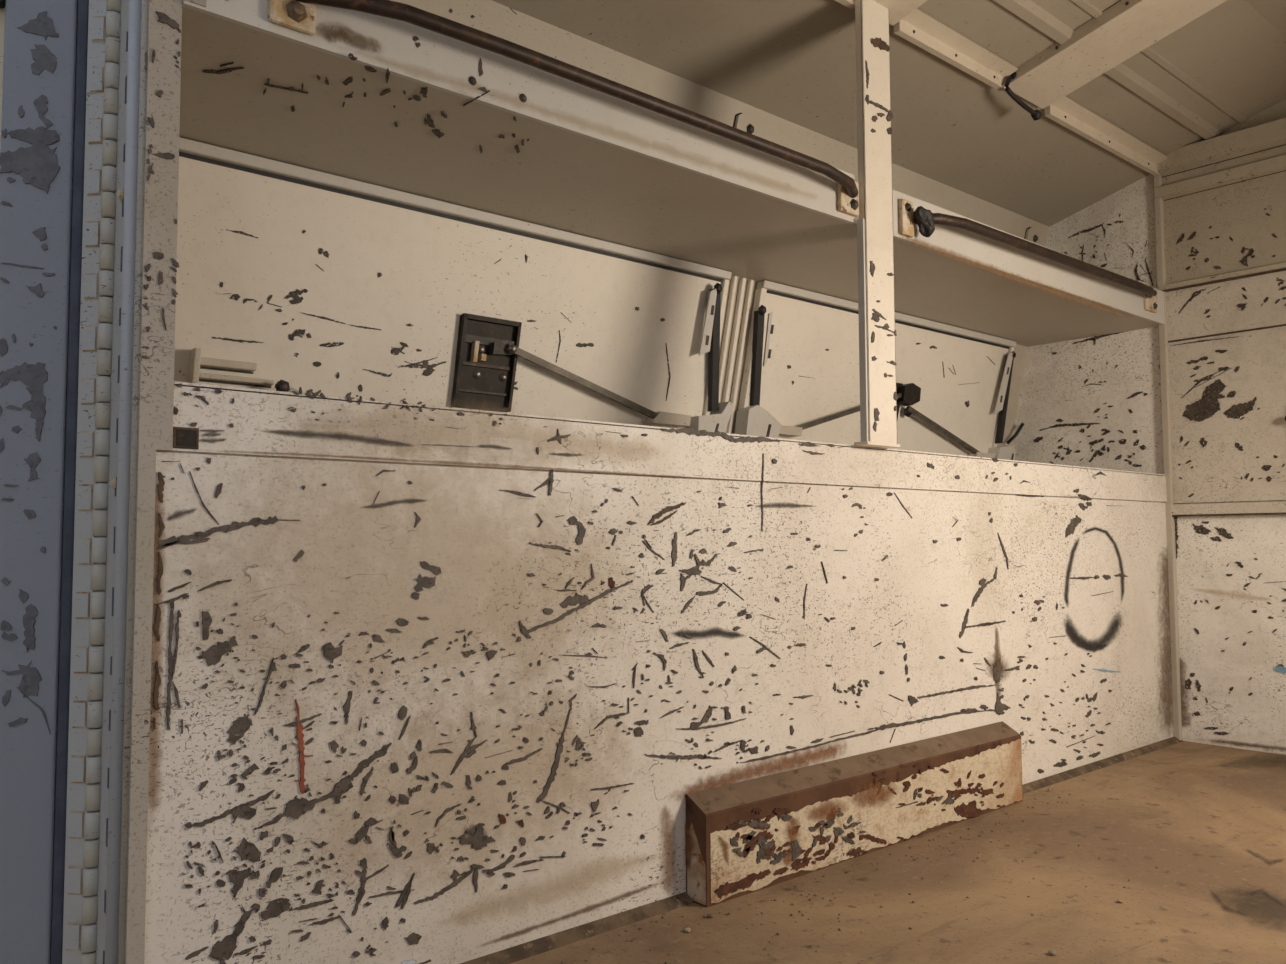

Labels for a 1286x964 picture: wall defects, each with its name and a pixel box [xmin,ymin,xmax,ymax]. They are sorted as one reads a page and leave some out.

rust [322,26,378,50]
peeling [1171,336,1260,422]
peeling [196,602,634,889]
peeling [602,647,776,769]
rust [684,746,837,796]
rust [784,818,798,864]
peeling [714,808,909,899]
rust [812,801,840,819]
rust [854,783,891,805]
peeling [873,764,1004,818]
peeling [992,635,1119,773]
peeling [182,831,431,964]